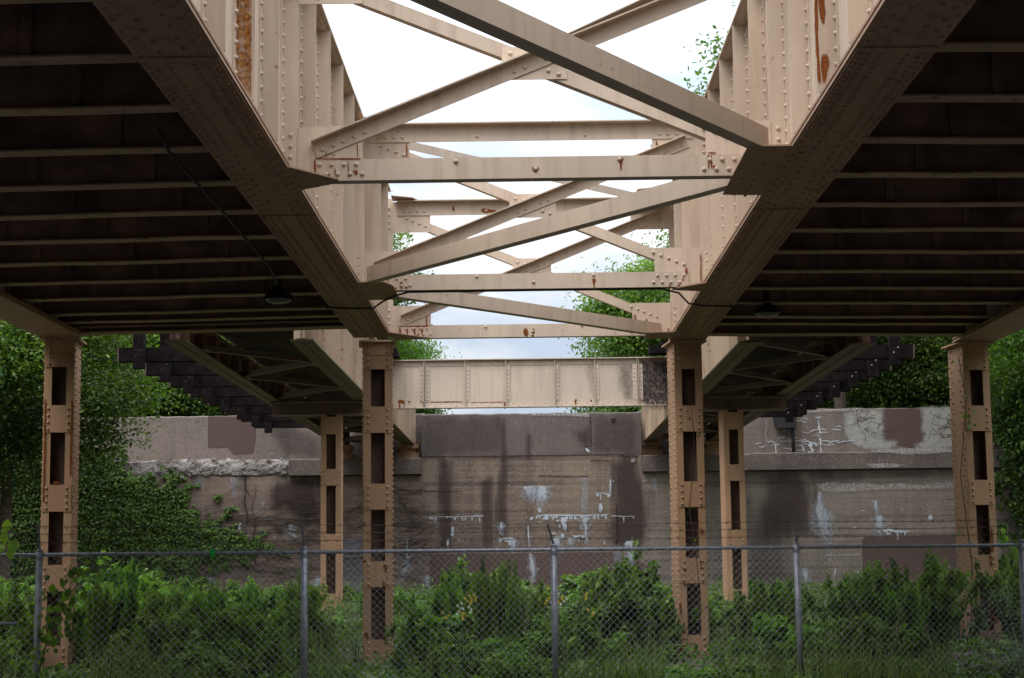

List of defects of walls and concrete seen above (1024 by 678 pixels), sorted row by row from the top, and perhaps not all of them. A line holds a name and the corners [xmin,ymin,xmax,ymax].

corrosion [236,0,252,94]
corrosion [814,0,829,82]
spalling [154,458,289,478]
damp [426,434,643,580]
damp [861,501,911,537]